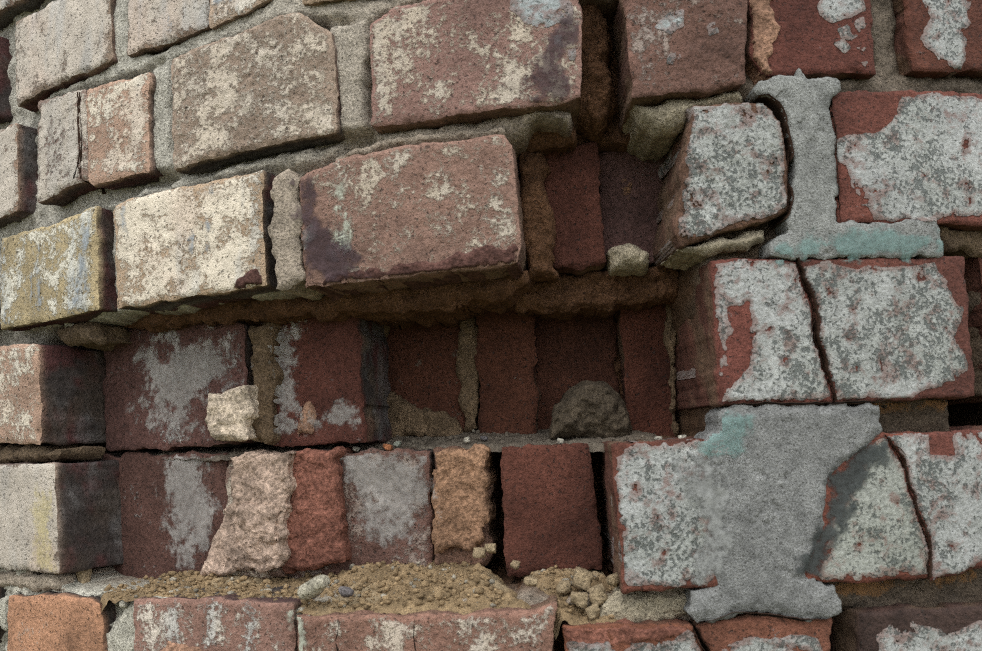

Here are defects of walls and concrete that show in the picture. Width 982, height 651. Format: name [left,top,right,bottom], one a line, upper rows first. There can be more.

peeling [920,0,971,78]
peeling [654,102,787,265]
peeling [834,92,982,222]
crack [724,257,881,406]
peeling [713,259,968,405]
spalling [200,385,356,576]
spalling [431,443,498,554]
crack [885,434,932,579]
spalling [564,618,701,651]
crack [688,612,829,651]
peeling [722,635,823,651]
peeling [876,620,982,651]